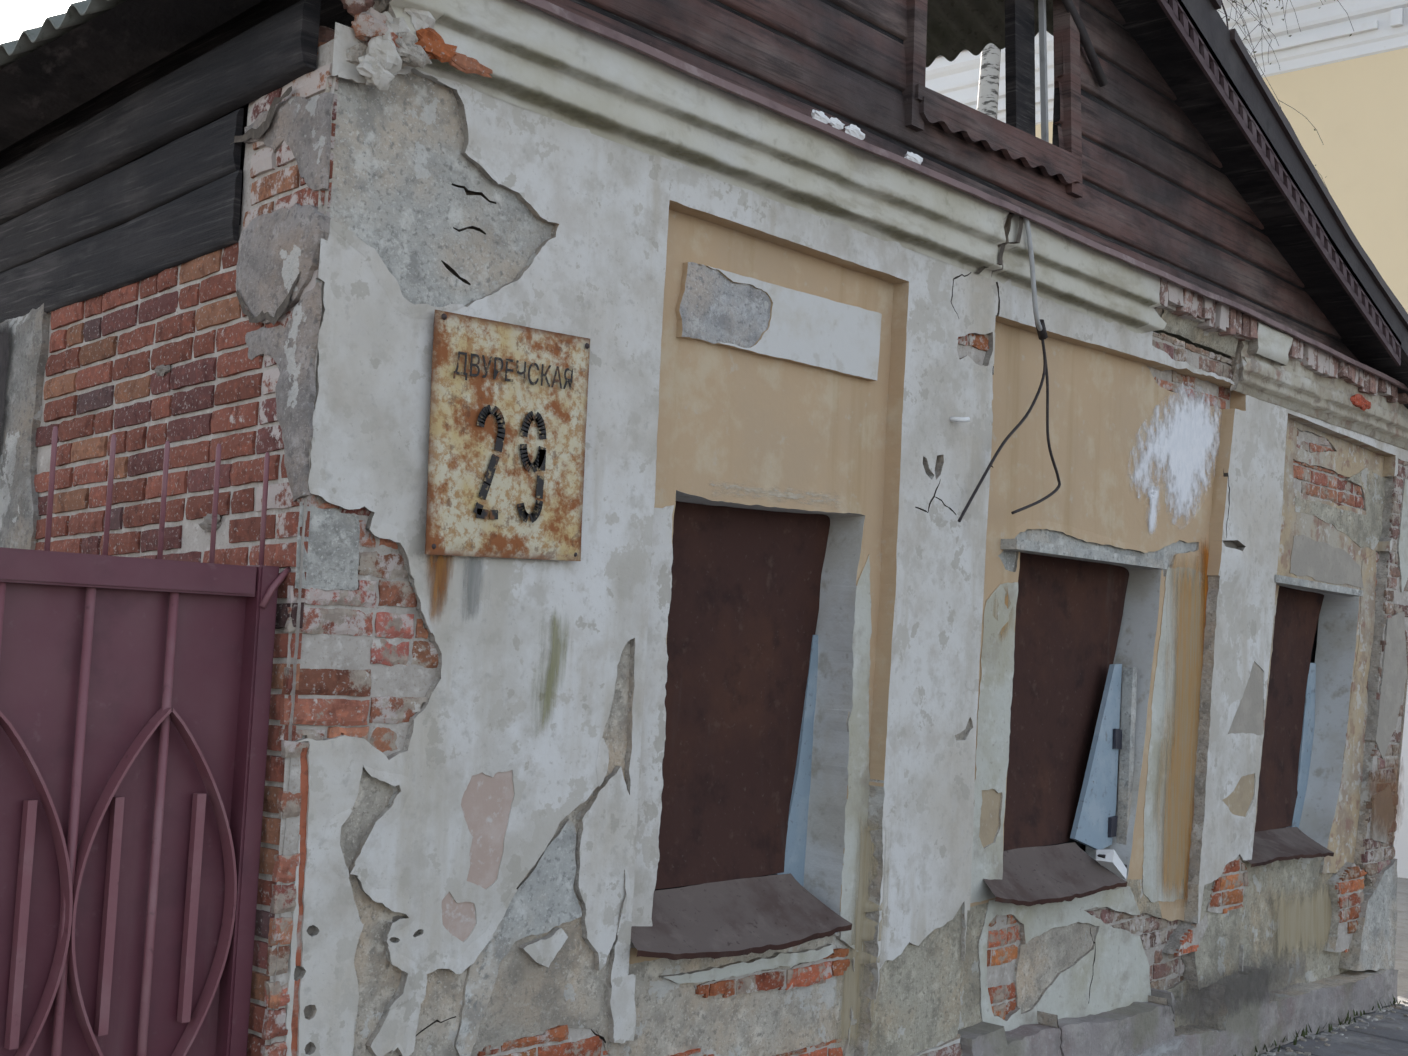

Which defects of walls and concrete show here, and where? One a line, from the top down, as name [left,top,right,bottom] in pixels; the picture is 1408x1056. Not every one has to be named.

spalling [244,0,559,320]
spalling [679,262,773,348]
flaking render [950,332,993,371]
flaking render [1146,332,1246,411]
spalling [923,454,944,480]
flaking render [1293,428,1366,511]
corrosion [429,555,452,615]
peeling [245,278,854,1056]
spalling [955,717,973,741]
flaking render [987,458,1408,1036]
peeling [979,789,1003,849]
peeling [867,902,973,1056]